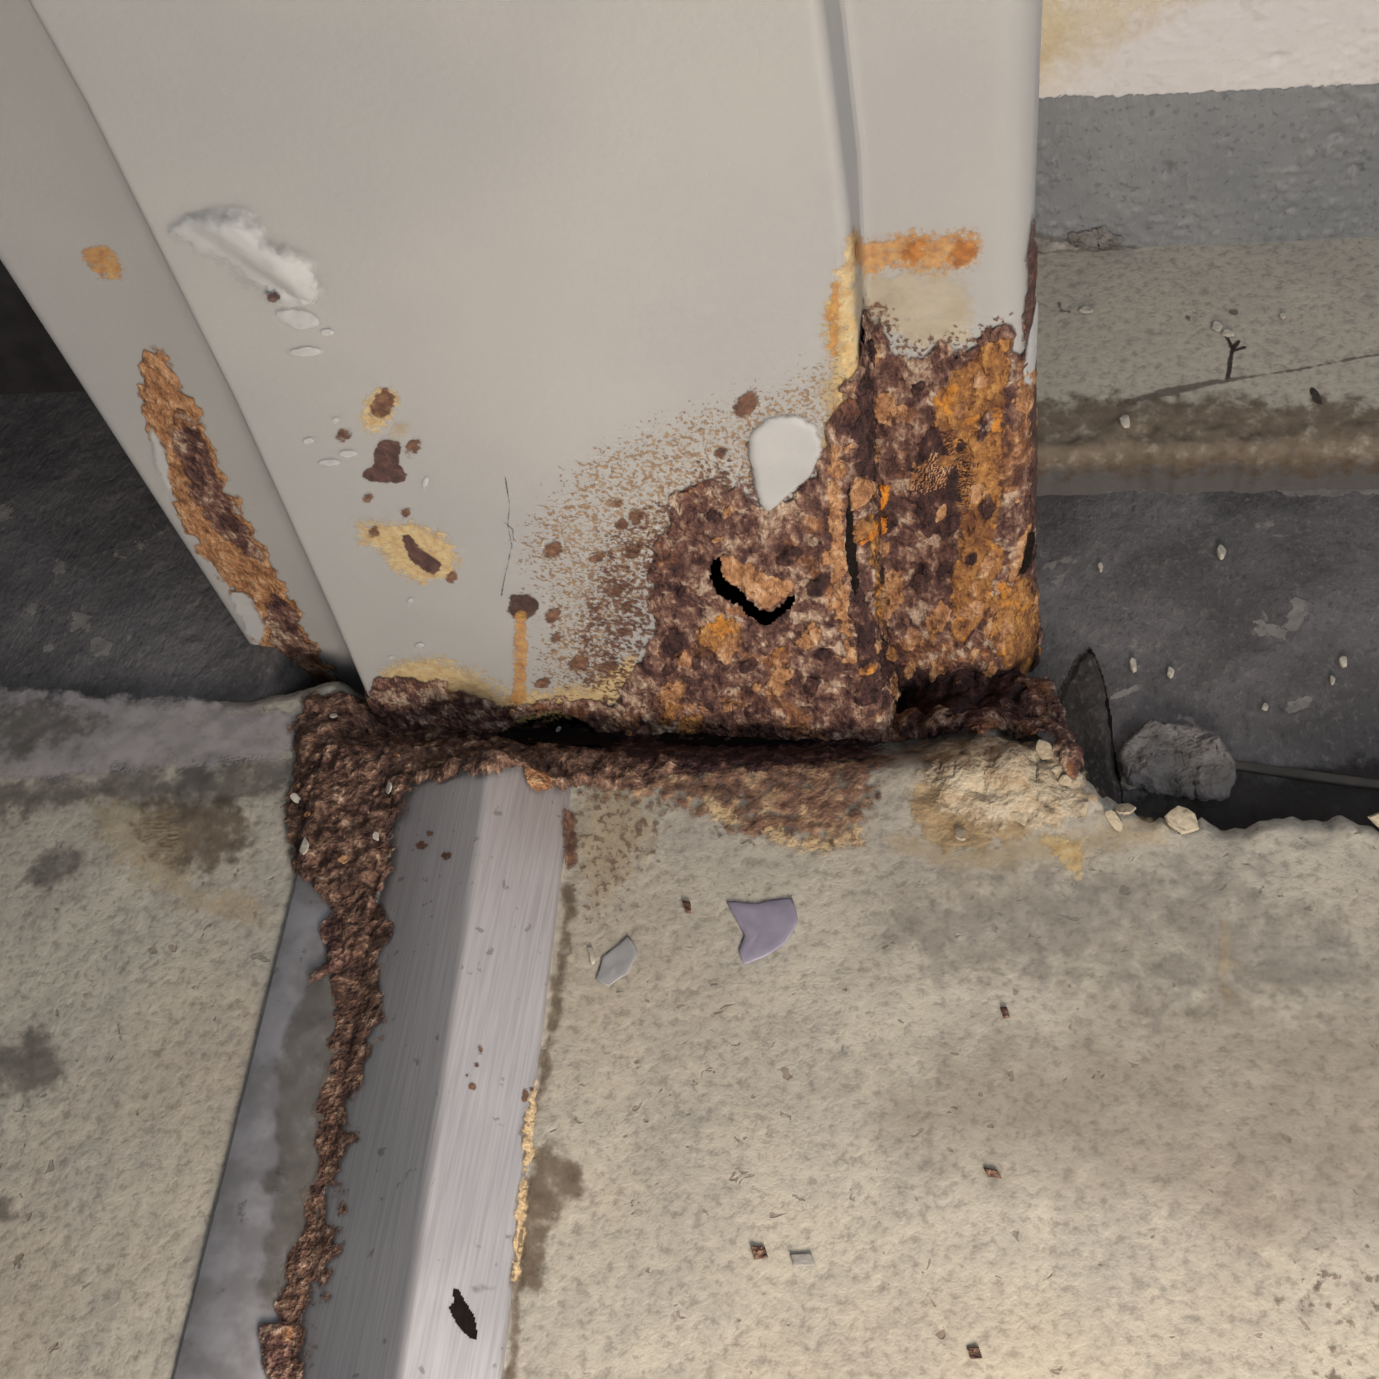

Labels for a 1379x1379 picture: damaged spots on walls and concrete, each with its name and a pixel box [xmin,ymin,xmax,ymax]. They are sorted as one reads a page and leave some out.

rust [137,348,342,684]
rust [336,429,351,442]
rust [358,219,1085,923]
spalling [905,649,1138,841]
spalling [1164,806,1199,834]